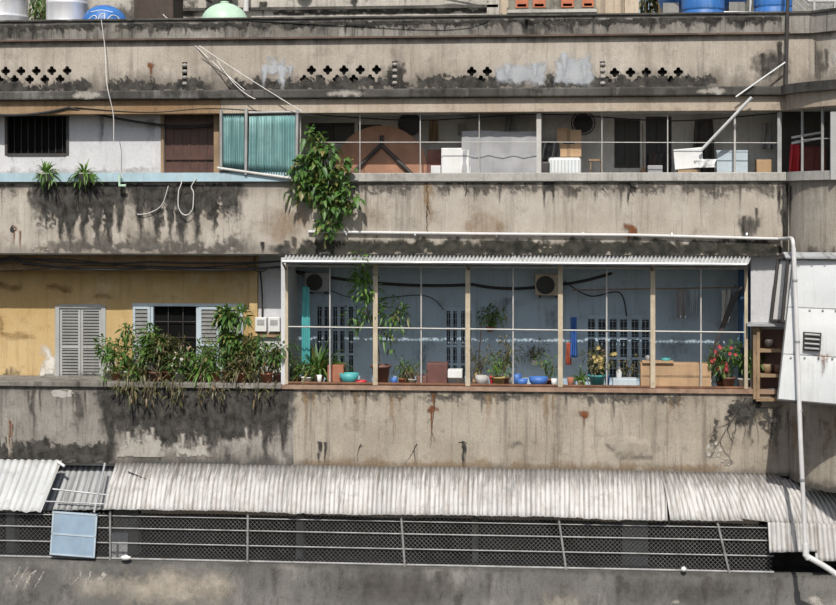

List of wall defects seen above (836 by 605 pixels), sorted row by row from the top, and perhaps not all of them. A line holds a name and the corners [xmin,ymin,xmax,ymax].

leakage [0,24,105,40]
leakage [116,0,782,35]
leakage [27,183,243,253]
crack [424,182,432,232]
leakage [438,181,666,205]
peeling [40,346,55,376]
leakage [0,387,408,463]
mould [710,396,789,447]